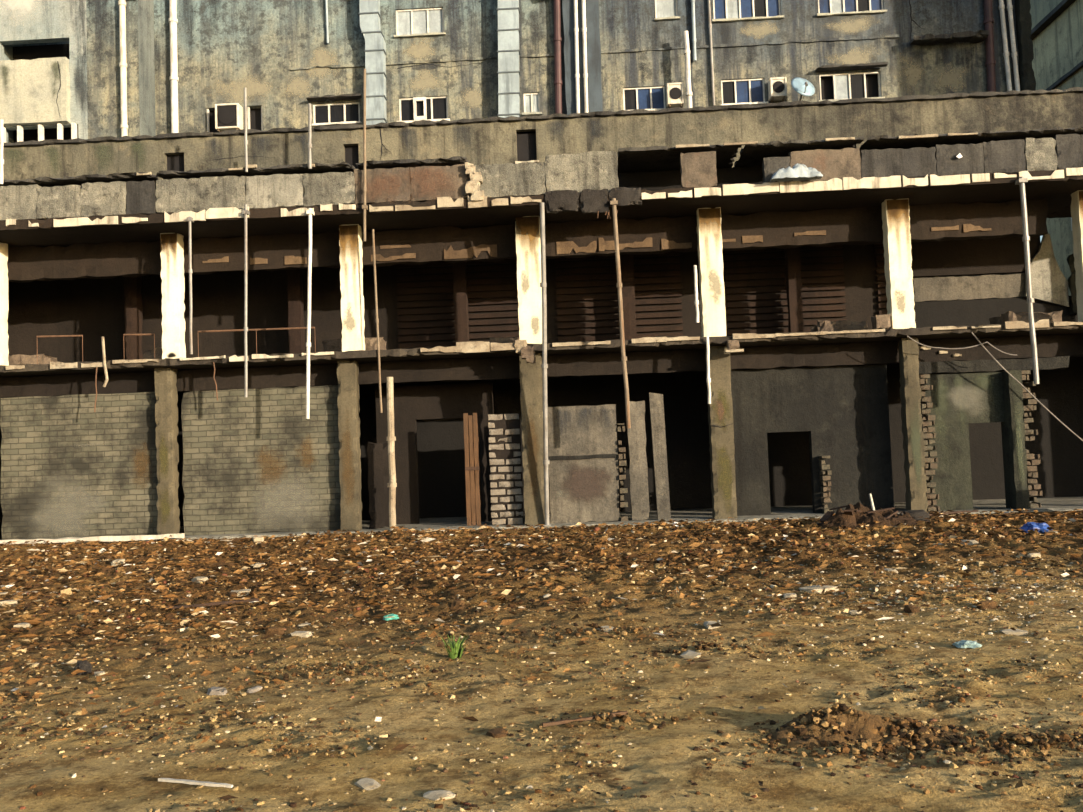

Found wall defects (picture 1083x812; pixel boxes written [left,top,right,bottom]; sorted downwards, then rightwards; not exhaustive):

leakage [79,0,107,49]
leakage [75,52,87,105]
peeling [281,203,356,217]
spalling [369,162,1083,219]